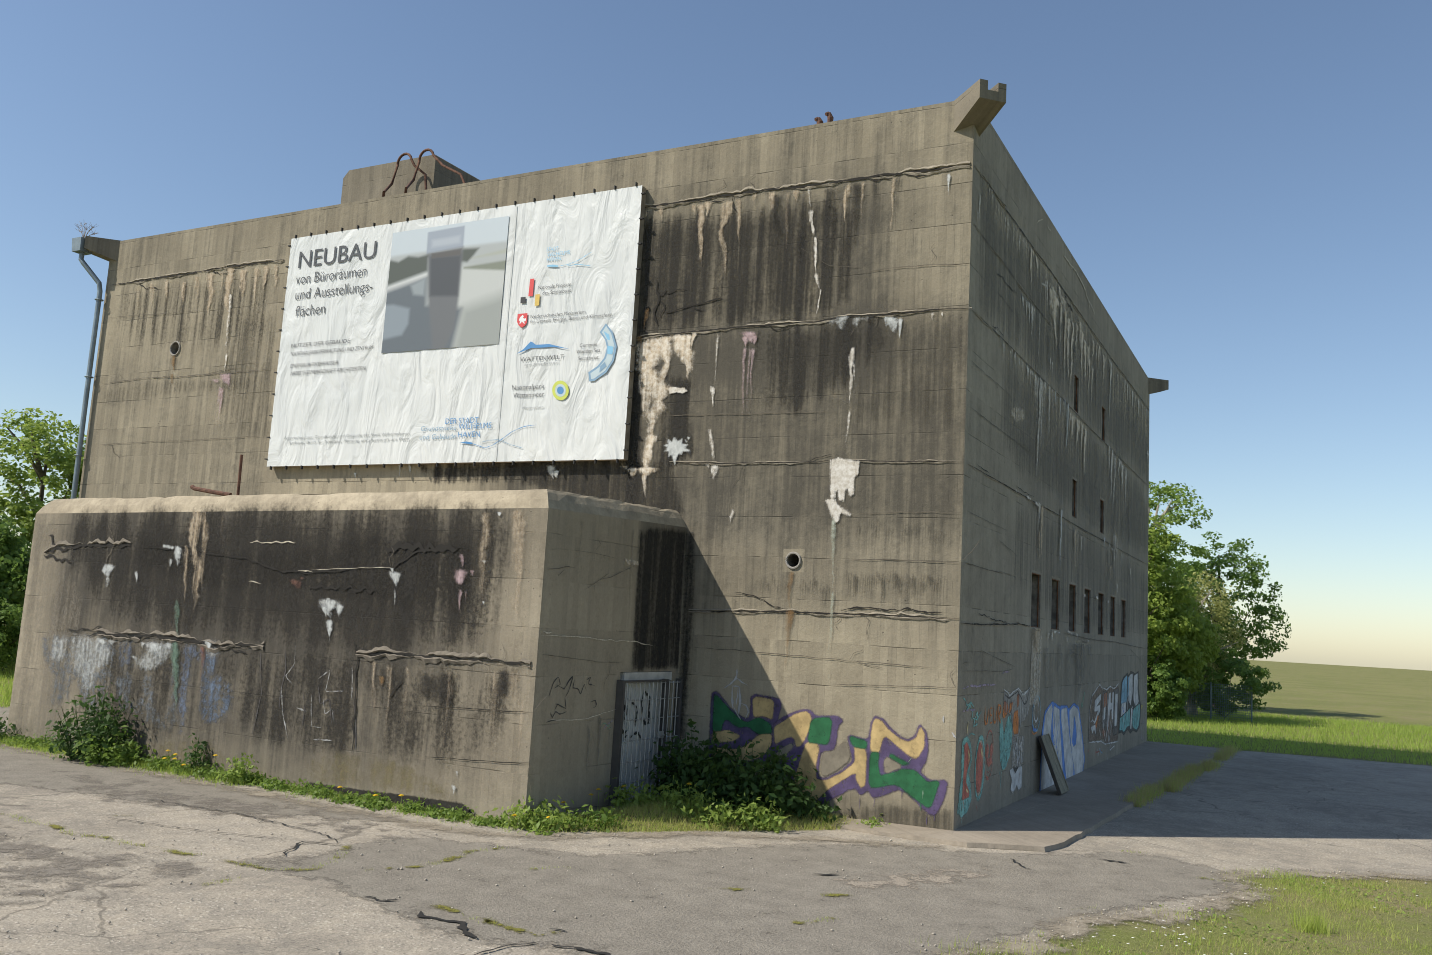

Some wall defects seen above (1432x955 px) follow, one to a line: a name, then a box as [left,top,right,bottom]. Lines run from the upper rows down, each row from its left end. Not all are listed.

crack [44,524,131,563]
damp [131,266,277,348]
damp [71,504,521,755]
damp [628,528,694,739]
damp [399,183,926,512]
damp [826,457,859,530]
crack [636,160,1150,574]
crack [689,592,1145,688]
damp [977,186,1149,621]